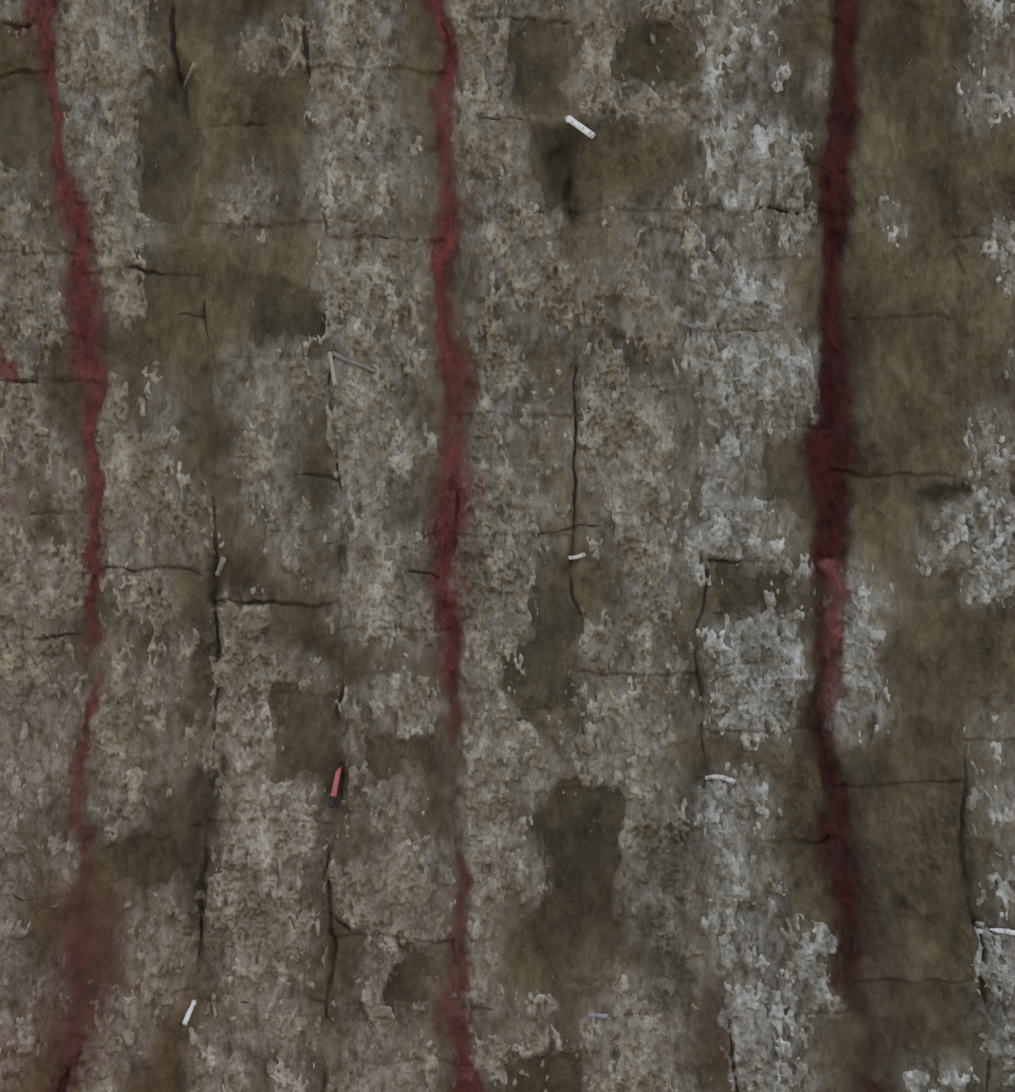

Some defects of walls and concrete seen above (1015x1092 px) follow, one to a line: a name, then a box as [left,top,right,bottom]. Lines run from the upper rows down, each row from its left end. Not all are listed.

crack [327,343,335,411]
crack [303,455,341,492]
crack [105,565,139,573]
crack [183,496,220,749]
crack [243,600,324,609]
crack [335,674,344,720]
crack [694,559,742,789]
crack [198,861,208,974]
crack [314,842,352,1018]
crack [443,938,492,1011]
crack [721,995,739,1092]